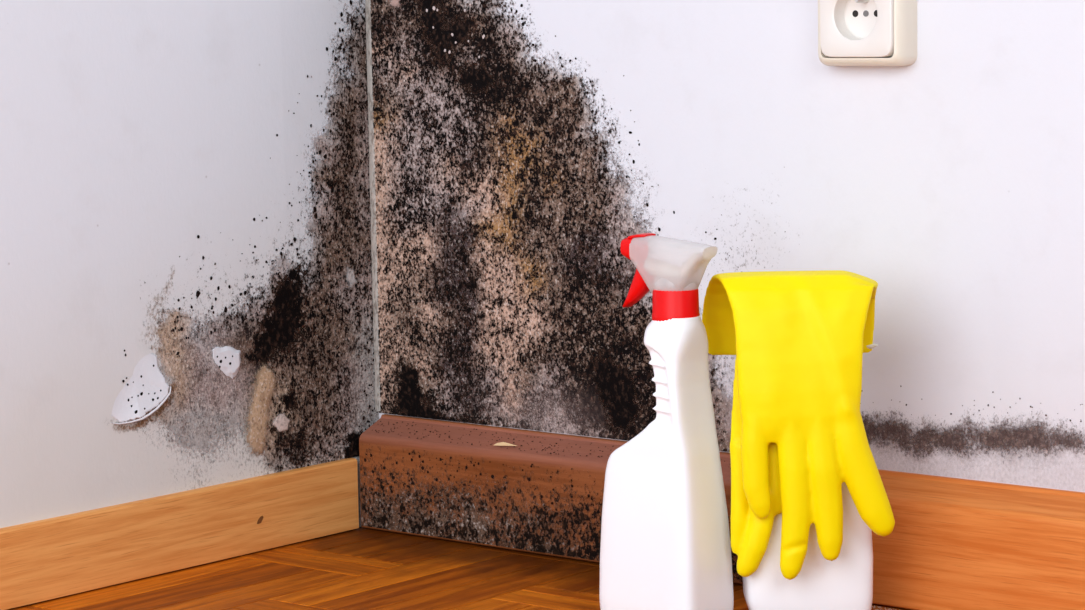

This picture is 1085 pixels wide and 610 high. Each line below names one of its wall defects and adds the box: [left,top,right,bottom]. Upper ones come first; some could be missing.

leakage [116,0,661,561]
peeling [111,353,171,425]
peeling [212,346,241,379]
leakage [708,353,733,469]
leakage [860,392,1084,456]
leakage [728,516,743,582]